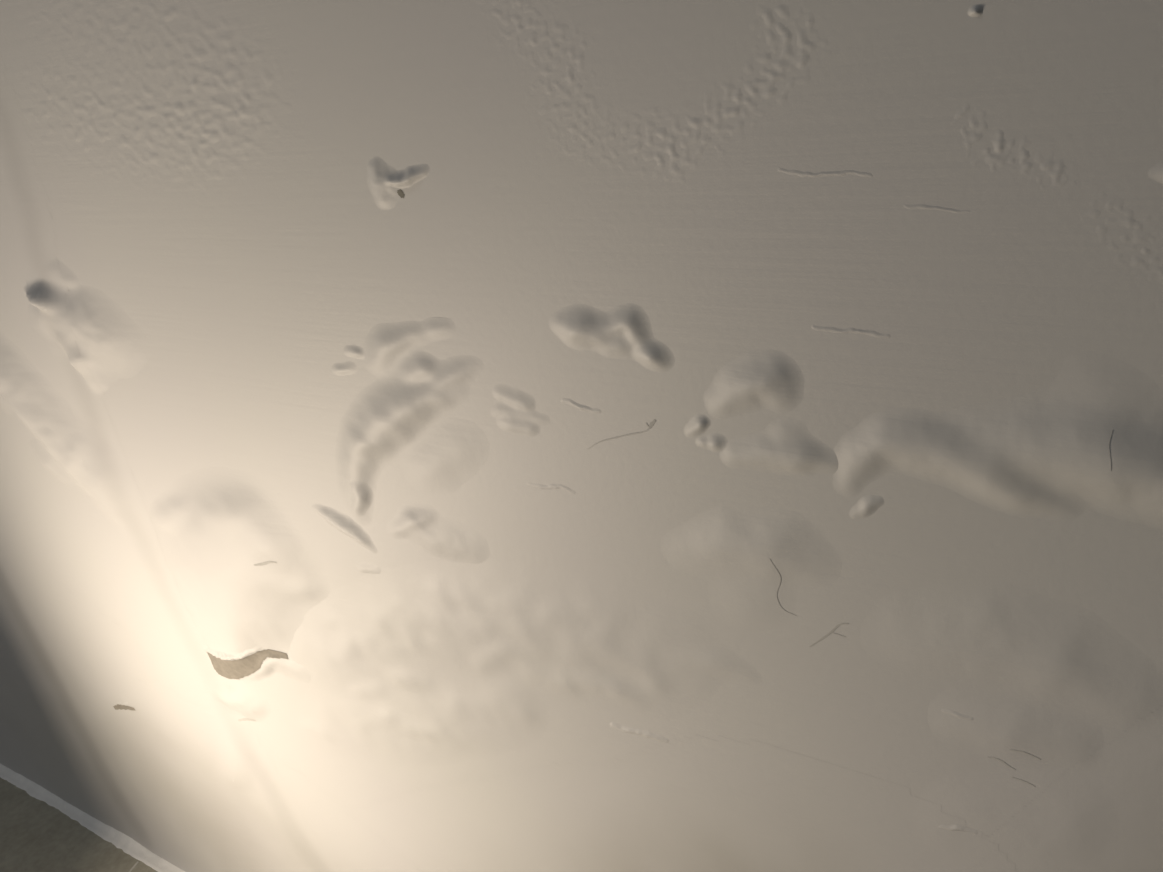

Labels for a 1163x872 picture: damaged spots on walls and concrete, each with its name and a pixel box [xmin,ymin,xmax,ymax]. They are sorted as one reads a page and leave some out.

peeling [149,466,381,683]